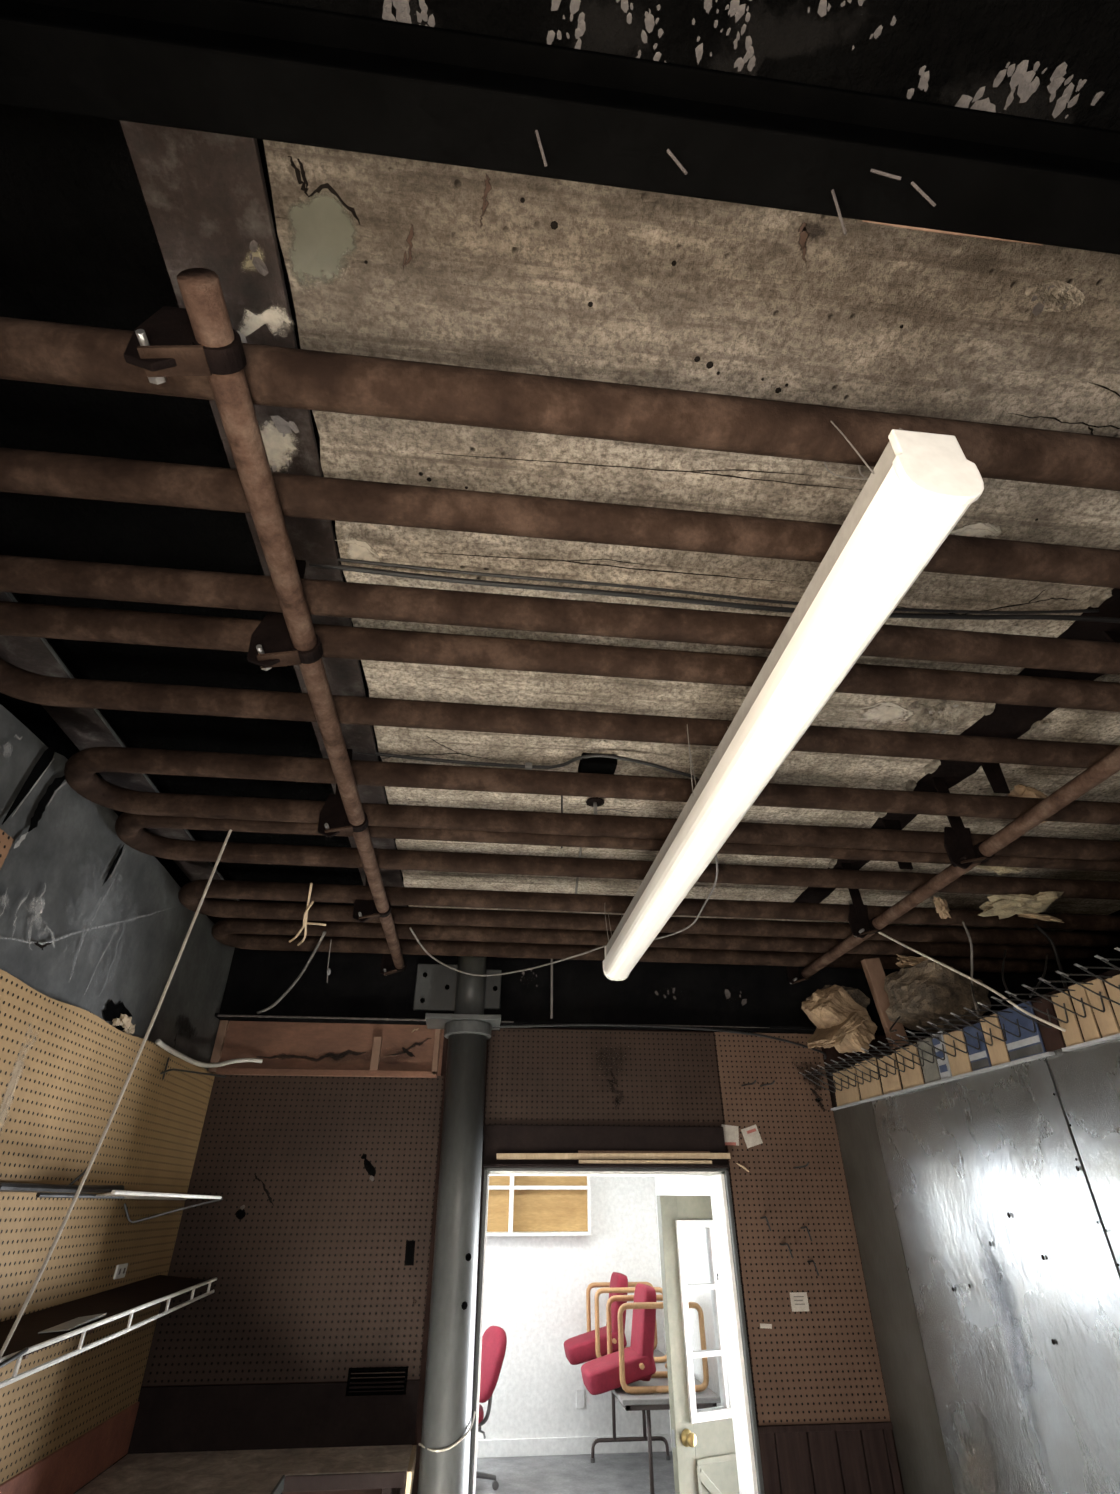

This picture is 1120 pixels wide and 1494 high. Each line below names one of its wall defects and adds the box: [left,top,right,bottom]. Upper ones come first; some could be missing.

peeling [382,0,435,27]
peeling [547,0,586,49]
peeling [616,0,667,63]
peeling [692,0,756,72]
peeling [808,0,865,17]
peeling [852,16,897,50]
peeling [906,65,929,99]
peeling [955,60,1105,119]
crack [288,156,360,224]
peeling [237,307,291,343]
peeling [259,415,299,472]